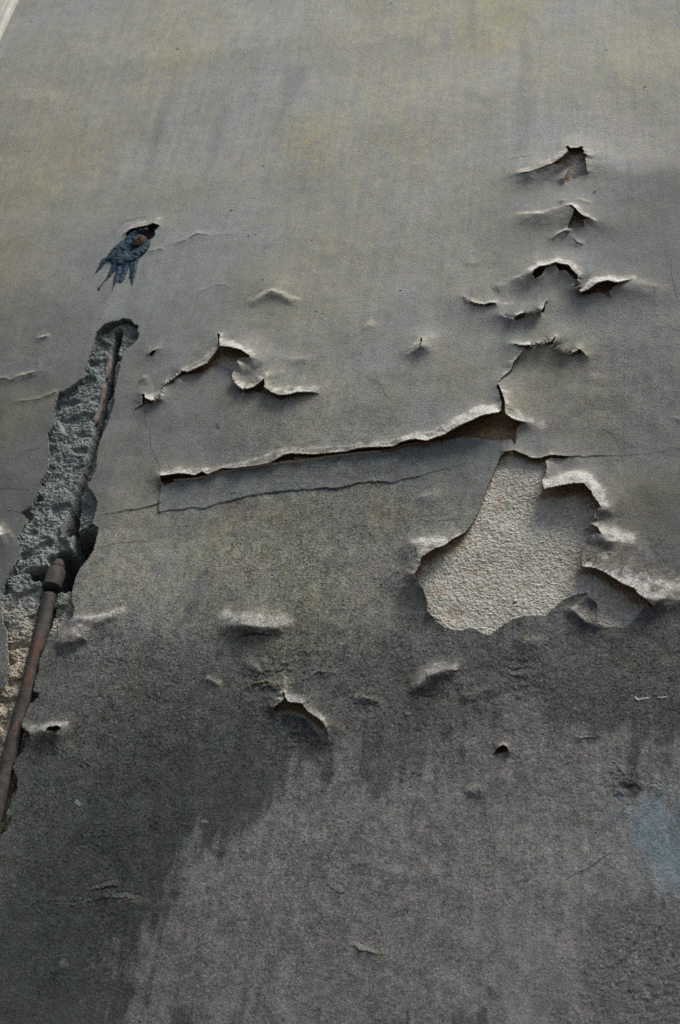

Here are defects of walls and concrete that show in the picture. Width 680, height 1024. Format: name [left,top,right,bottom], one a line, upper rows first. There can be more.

peeling [115,213,170,241]
peeling [454,134,643,370]
spalling [0,318,140,692]
peeling [114,322,332,414]
crack [101,344,547,515]
flaking render [385,435,664,638]
flaking render [40,711,78,733]